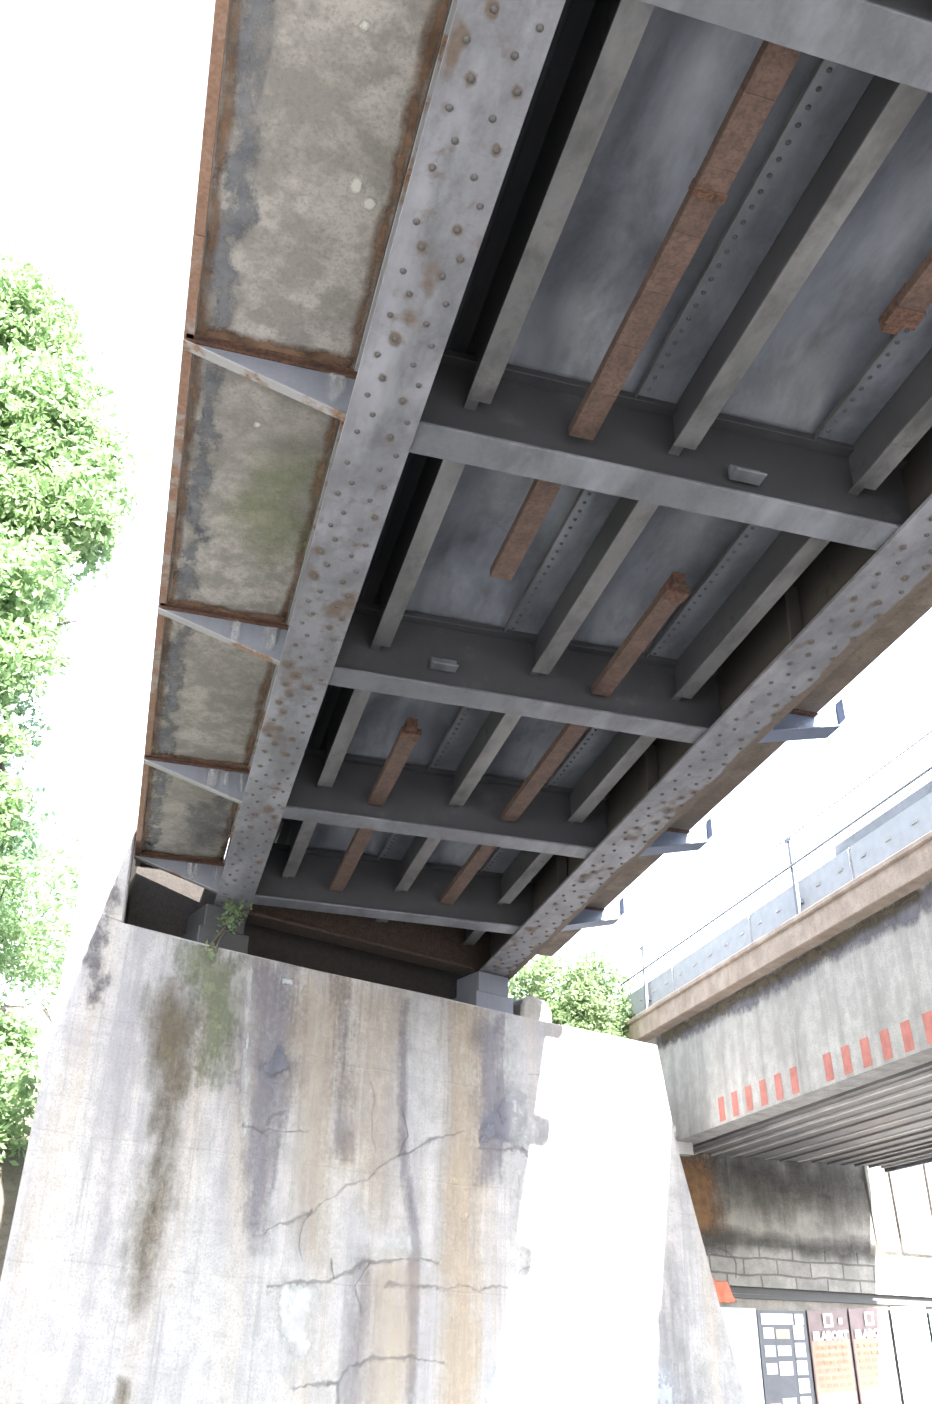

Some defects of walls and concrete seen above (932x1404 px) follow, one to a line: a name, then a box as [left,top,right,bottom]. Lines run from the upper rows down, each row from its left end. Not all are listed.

leakage [206,0,274,330]
corrosion [568,40,802,441]
corrosion [879,250,932,335]
corrosion [490,479,562,581]
corrosion [591,572,690,697]
leakage [242,962,296,1230]
leakage [478,1024,522,1179]
leakage [714,1157,869,1215]
crack [299,1210,370,1309]